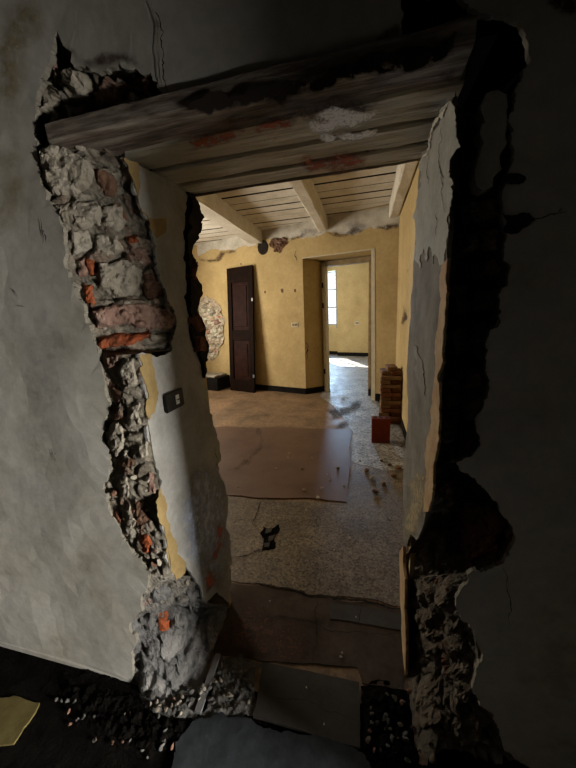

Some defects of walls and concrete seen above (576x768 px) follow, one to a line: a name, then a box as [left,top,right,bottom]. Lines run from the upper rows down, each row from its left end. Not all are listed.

spalling [38,39,228,703]
flaking render [269,237,289,253]
spalling [399,21,535,765]